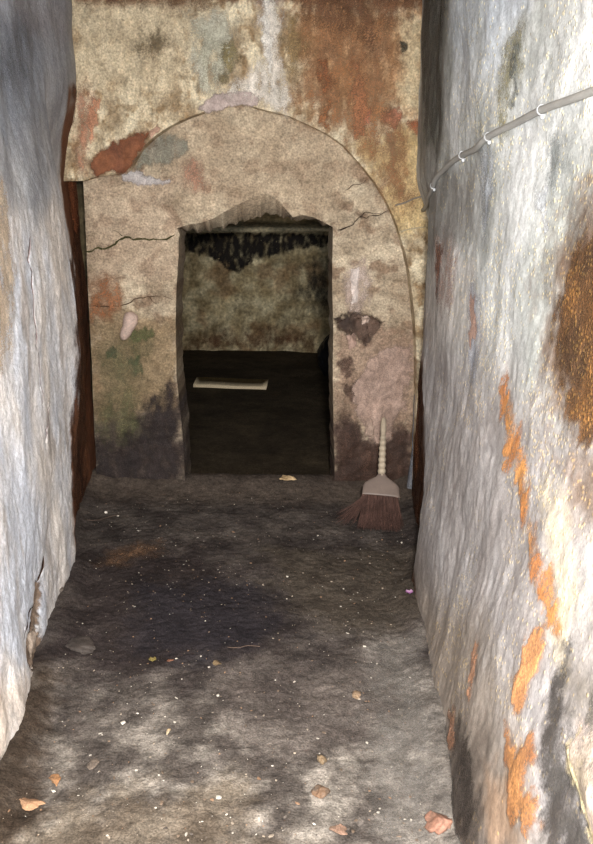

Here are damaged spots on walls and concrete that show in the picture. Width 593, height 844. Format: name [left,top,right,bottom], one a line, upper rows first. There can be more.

leakage [136,29,169,58]
leakage [167,0,445,152]
spalling [90,126,170,186]
crack [86,230,174,253]
crack [338,211,386,231]
spalling [334,258,381,350]
peeling [352,345,413,445]
corrosion [498,373,561,715]
corrosion [503,720,542,839]